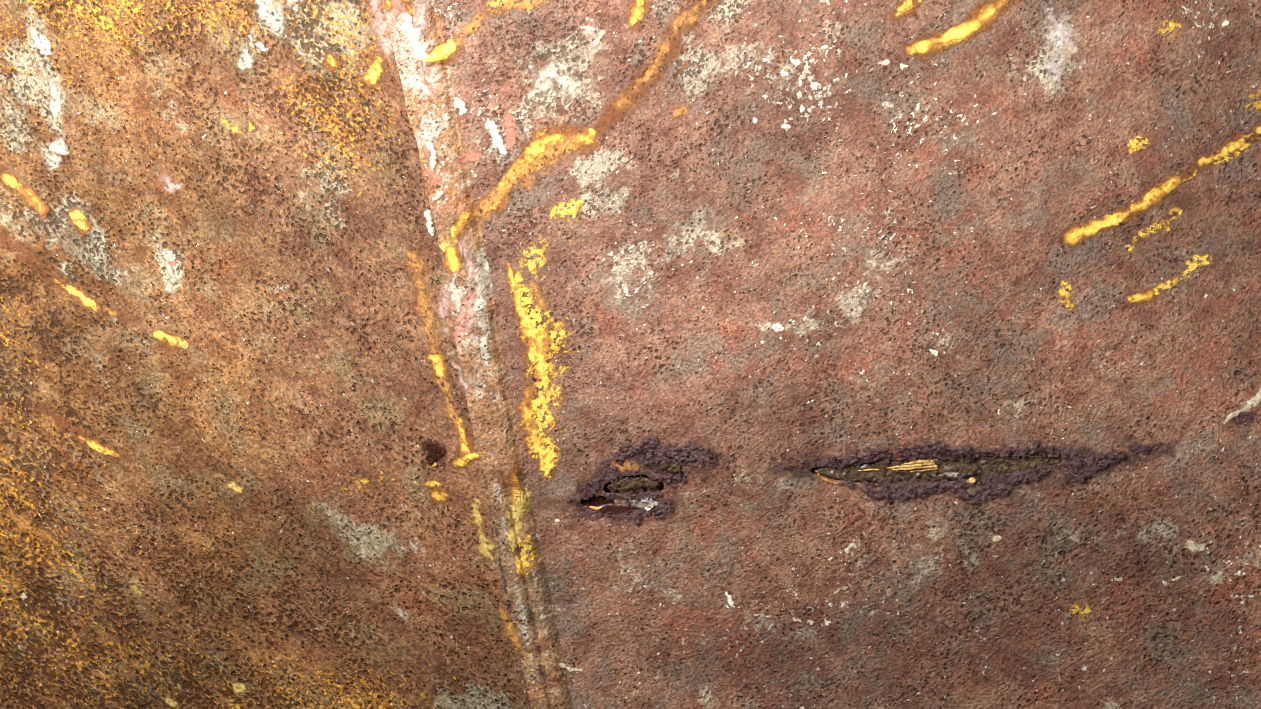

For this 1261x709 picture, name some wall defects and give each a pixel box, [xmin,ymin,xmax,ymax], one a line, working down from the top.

corrosion [906,0,1020,61]
corrosion [0,169,49,219]
corrosion [422,0,717,274]
corrosion [1060,84,1261,253]
corrosion [0,230,117,315]
corrosion [1126,254,1213,305]
corrosion [153,330,189,351]
corrosion [407,252,480,469]
corrosion [506,238,579,479]
corrosion [468,468,538,577]
corrosion [566,436,721,525]
corrosion [774,439,1164,505]